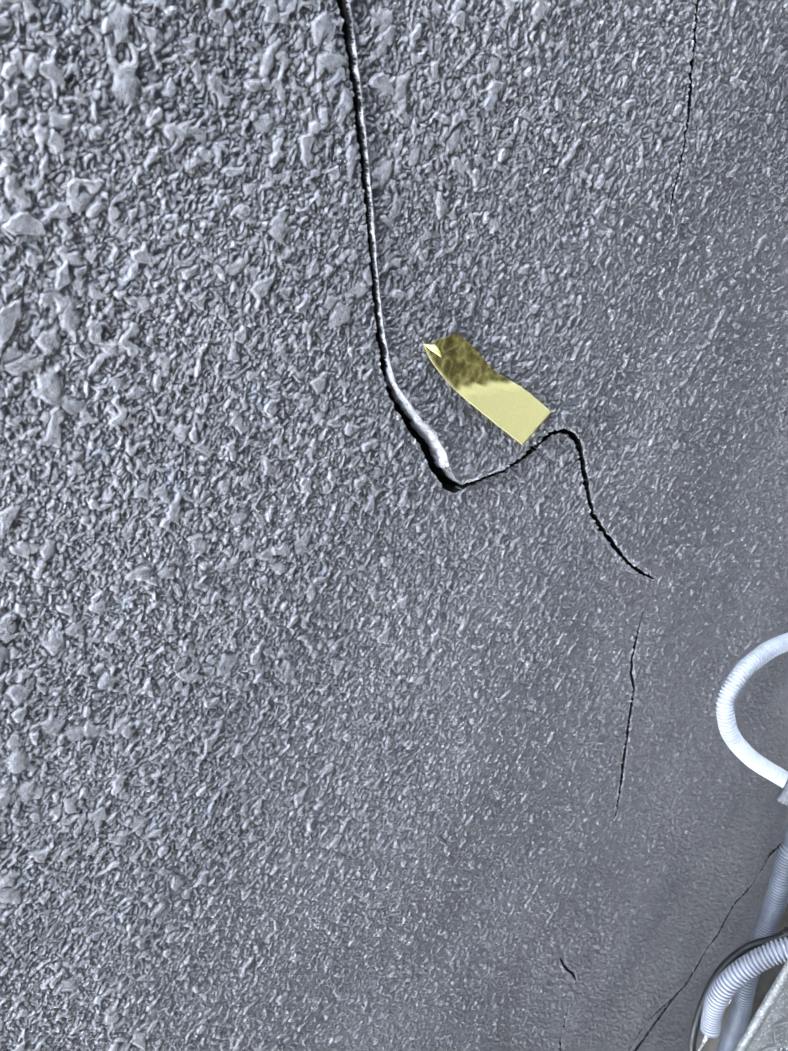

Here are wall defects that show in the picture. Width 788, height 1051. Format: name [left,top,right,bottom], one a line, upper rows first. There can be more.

crack [335,0,656,582]
crack [613,610,645,819]
crack [628,837,785,1051]